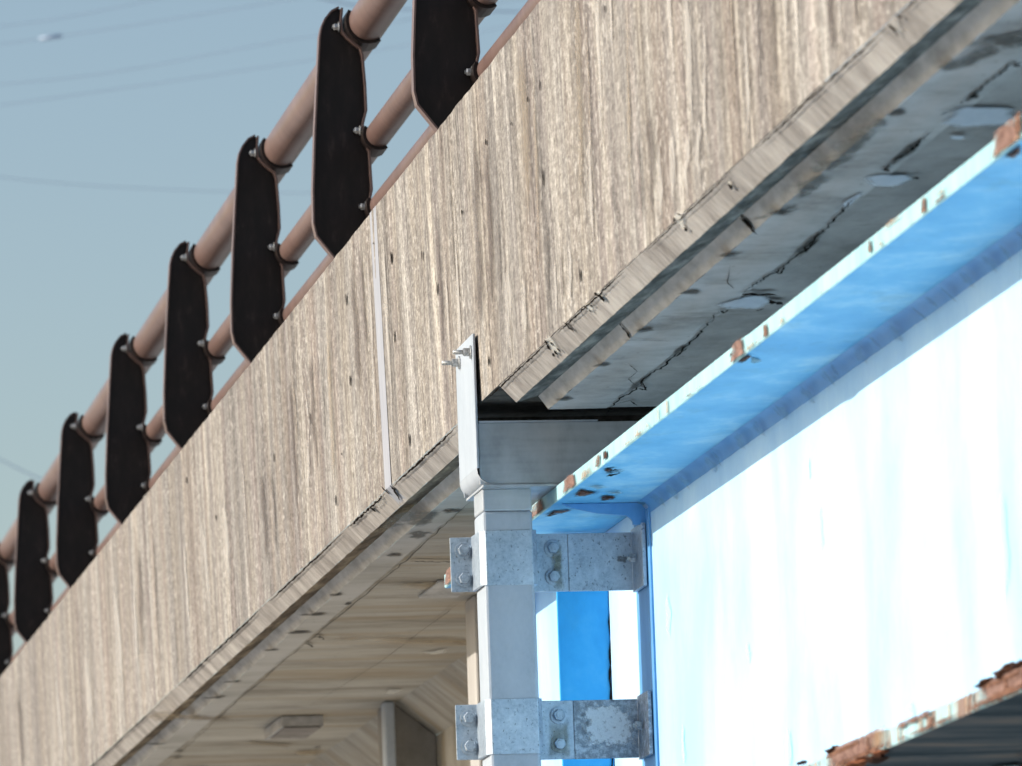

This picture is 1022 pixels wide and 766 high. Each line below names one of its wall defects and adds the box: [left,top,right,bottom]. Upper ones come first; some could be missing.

crack [961,62,1020,104]
crack [647,0,916,250]
crack [881,133,929,172]
corrosion [992,111,1021,158]
crack [727,193,861,292]
crack [608,311,719,412]
corrosion [730,324,767,363]
corrosion [563,451,616,501]
corrosion [531,499,569,517]
corrosion [965,660,1022,712]
corrosion [796,726,890,766]
corrosion [897,706,952,741]